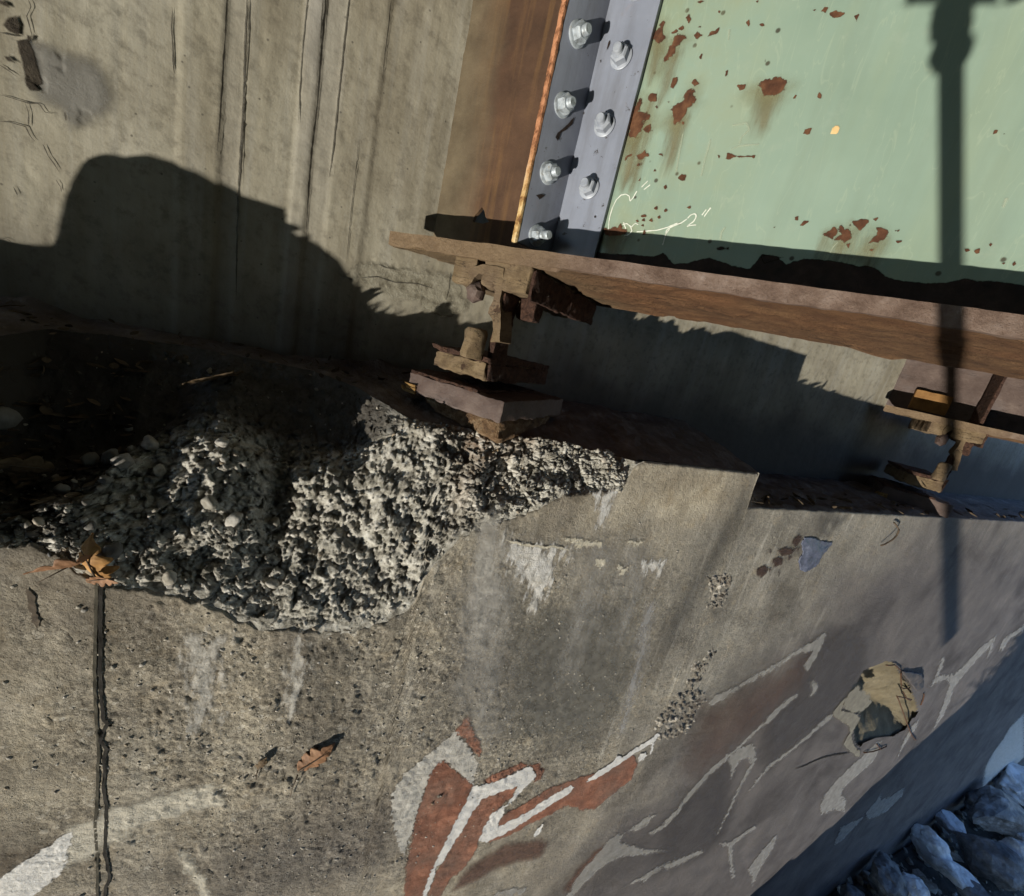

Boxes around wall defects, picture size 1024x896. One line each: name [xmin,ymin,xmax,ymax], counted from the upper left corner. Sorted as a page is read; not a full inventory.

corrosion [813,7,859,20]
crack [0,65,66,191]
corrosion [624,15,719,182]
corrosion [737,77,797,127]
spalling [0,329,644,635]
spalling [706,573,731,609]
corrosion [757,535,801,578]
crack [92,583,112,896]
spalling [654,647,717,740]